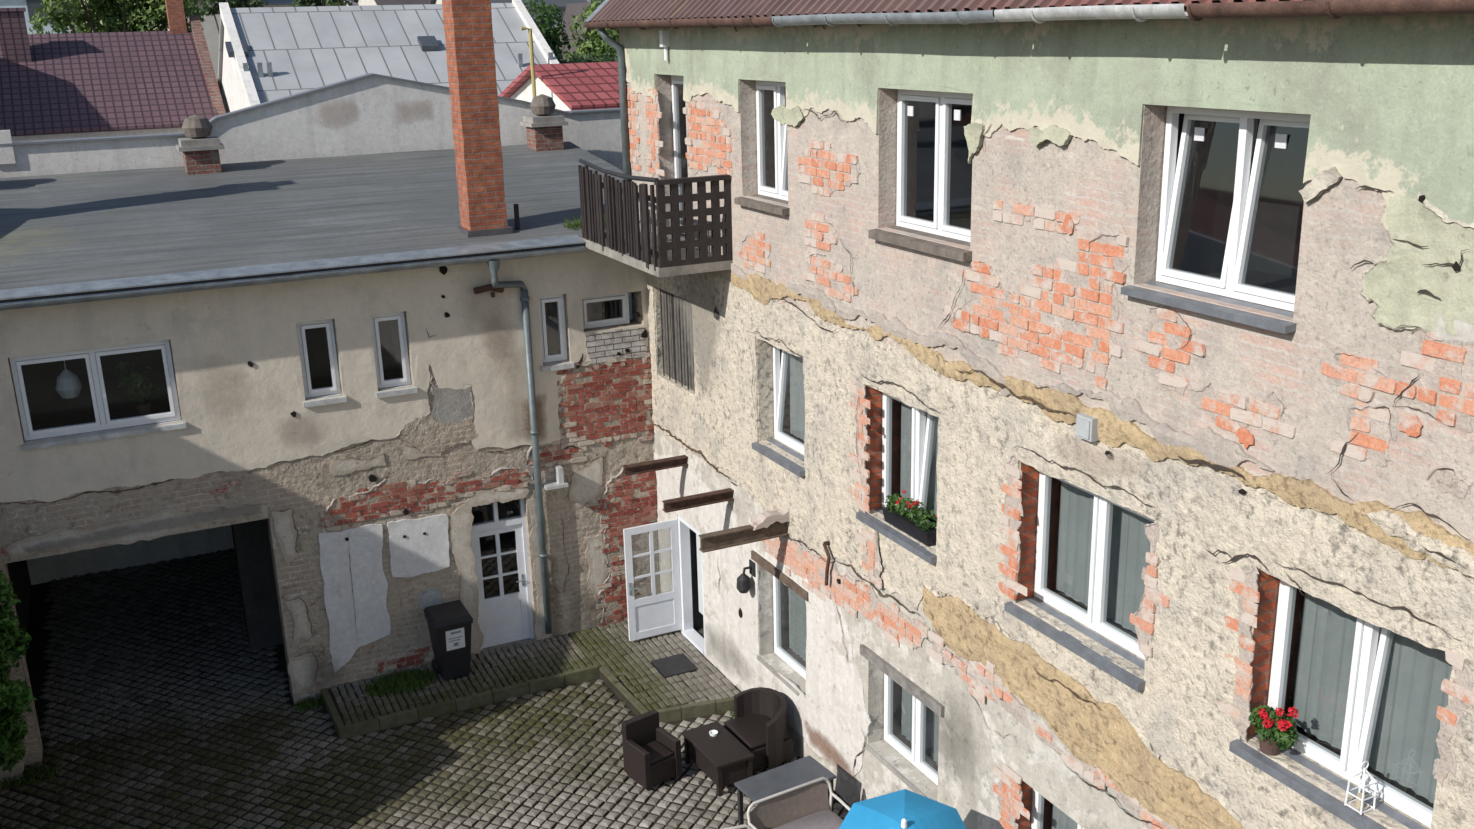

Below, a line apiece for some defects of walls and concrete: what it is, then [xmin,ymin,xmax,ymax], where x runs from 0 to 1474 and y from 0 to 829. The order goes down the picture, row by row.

flaking render [621,84,665,178]
flaking render [683,99,732,176]
flaking render [798,140,861,303]
peeling [964,122,985,164]
peeling [1299,167,1342,203]
flaking render [944,200,1296,449]
peeling [1321,192,1474,466]
flaking render [320,312,658,627]
flaking render [1426,465,1471,498]
flaking render [762,375,1211,829]
flaking render [1217,567,1260,743]
crack [1205,548,1461,641]